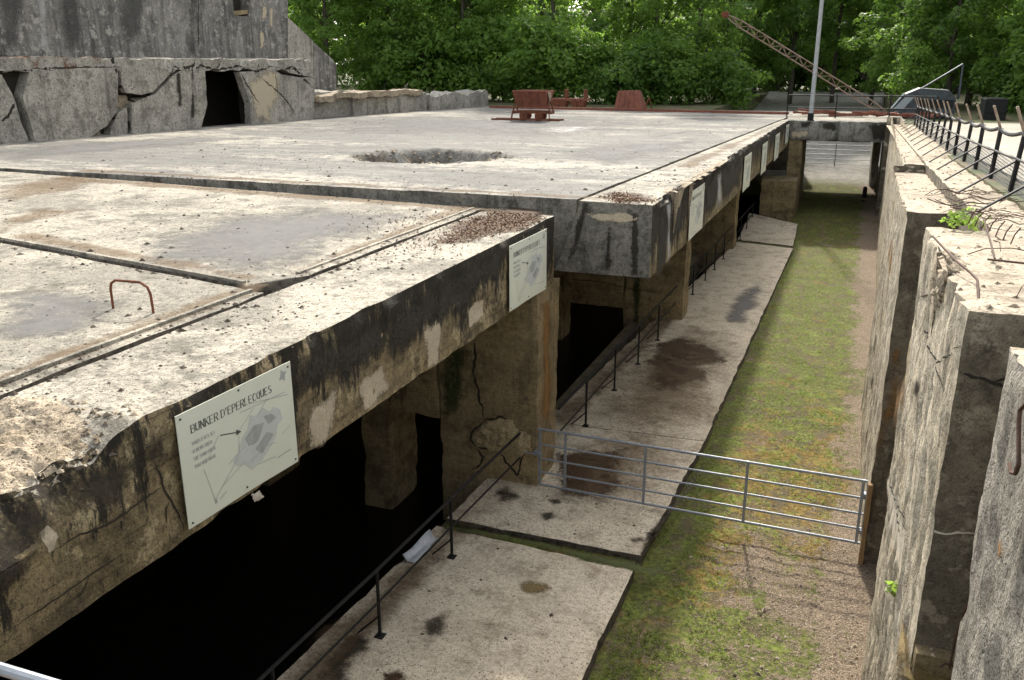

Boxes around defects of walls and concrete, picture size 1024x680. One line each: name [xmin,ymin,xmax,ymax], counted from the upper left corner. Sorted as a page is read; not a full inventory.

crack [0,57,314,132]
spalling [919,188,1024,333]
damp [1,293,99,337]
damp [558,213,726,421]
crack [924,330,1005,389]
spalling [0,396,89,494]
crack [470,343,528,476]
spalling [472,418,532,456]
crack [52,463,184,553]